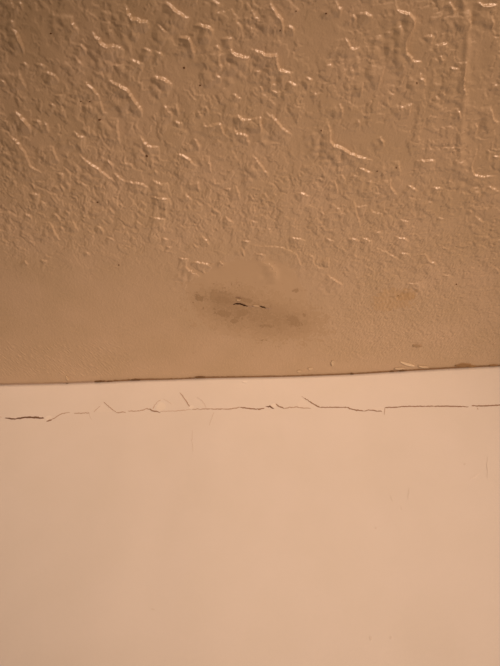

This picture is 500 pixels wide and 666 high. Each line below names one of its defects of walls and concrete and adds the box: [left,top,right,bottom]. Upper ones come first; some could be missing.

leakage [175,277,350,356]
crack [0,365,500,425]